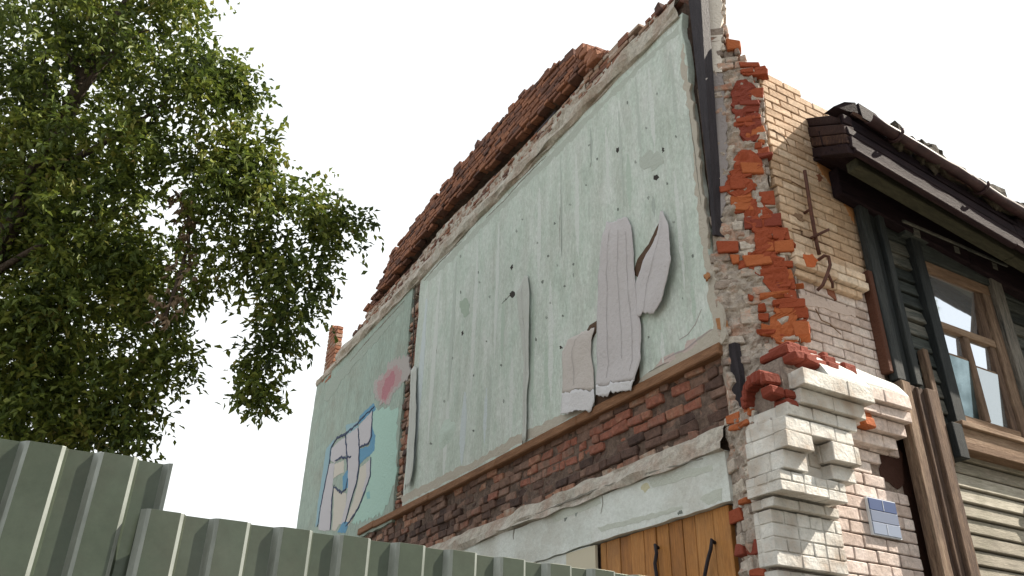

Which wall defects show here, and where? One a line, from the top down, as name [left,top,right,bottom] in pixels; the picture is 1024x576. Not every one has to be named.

peeling [357,0,818,503]